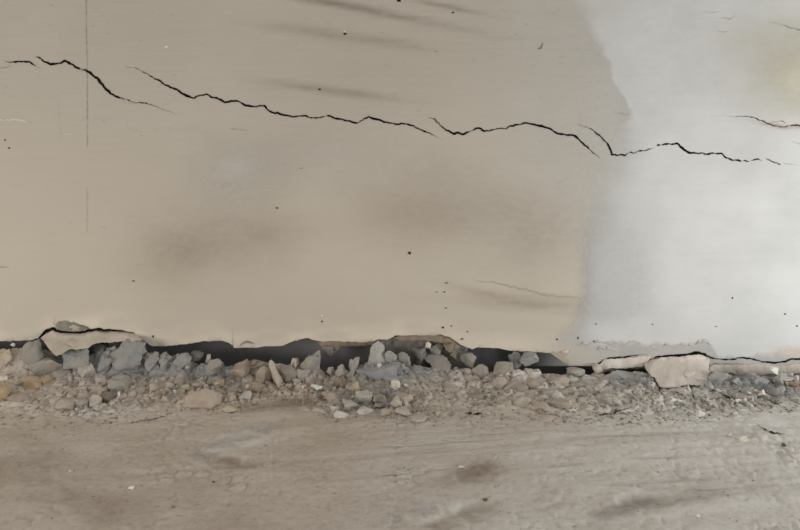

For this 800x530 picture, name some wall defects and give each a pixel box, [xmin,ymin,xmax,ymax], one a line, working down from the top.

crack [9,57,151,105]
crack [143,72,781,165]
flaking render [41,320,143,356]
flaking render [318,334,468,369]
flaking render [579,339,711,403]
crack [597,351,800,404]
flaking render [769,367,794,383]